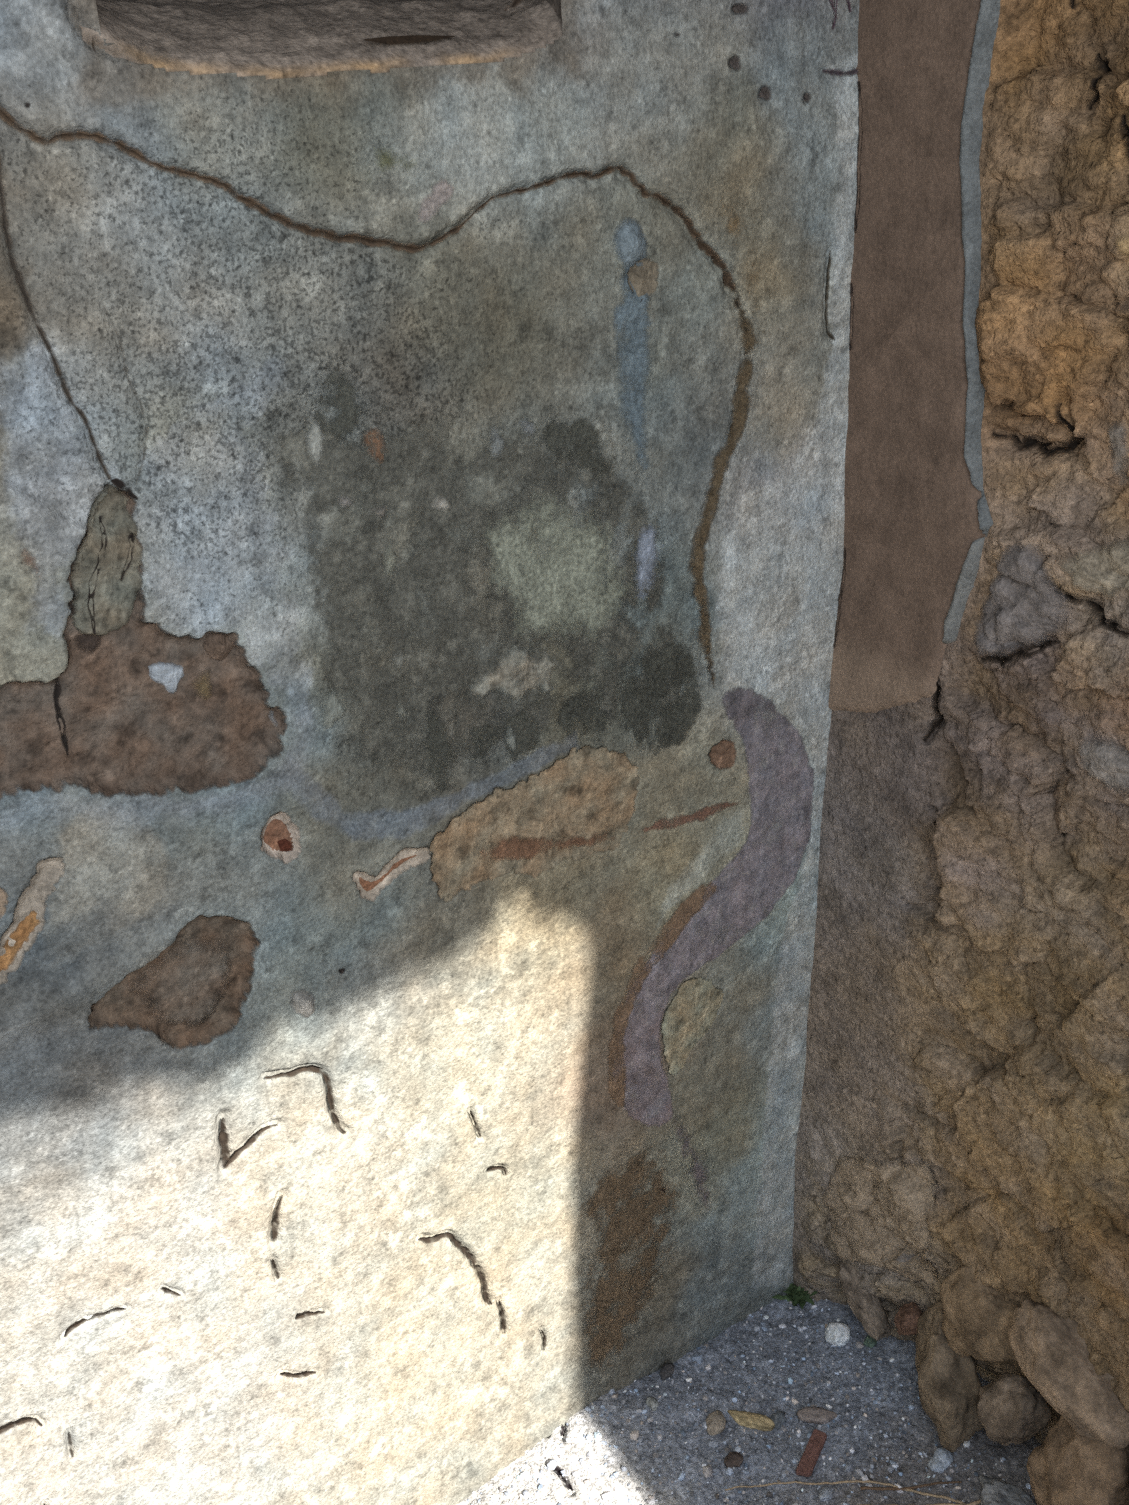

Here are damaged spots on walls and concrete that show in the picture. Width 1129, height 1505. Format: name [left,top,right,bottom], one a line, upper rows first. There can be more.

crack [0,107,756,687]
damp [614,256,650,467]
spalling [0,478,287,798]
damp [280,373,701,791]
peeling [353,746,639,902]
spalling [88,915,260,1049]
crack [219,1118,277,1168]
crack [265,1065,347,1134]
crack [65,1307,126,1337]
crack [420,1232,546,1351]
crack [0,1417,74,1458]
crack [554,1422,574,1491]